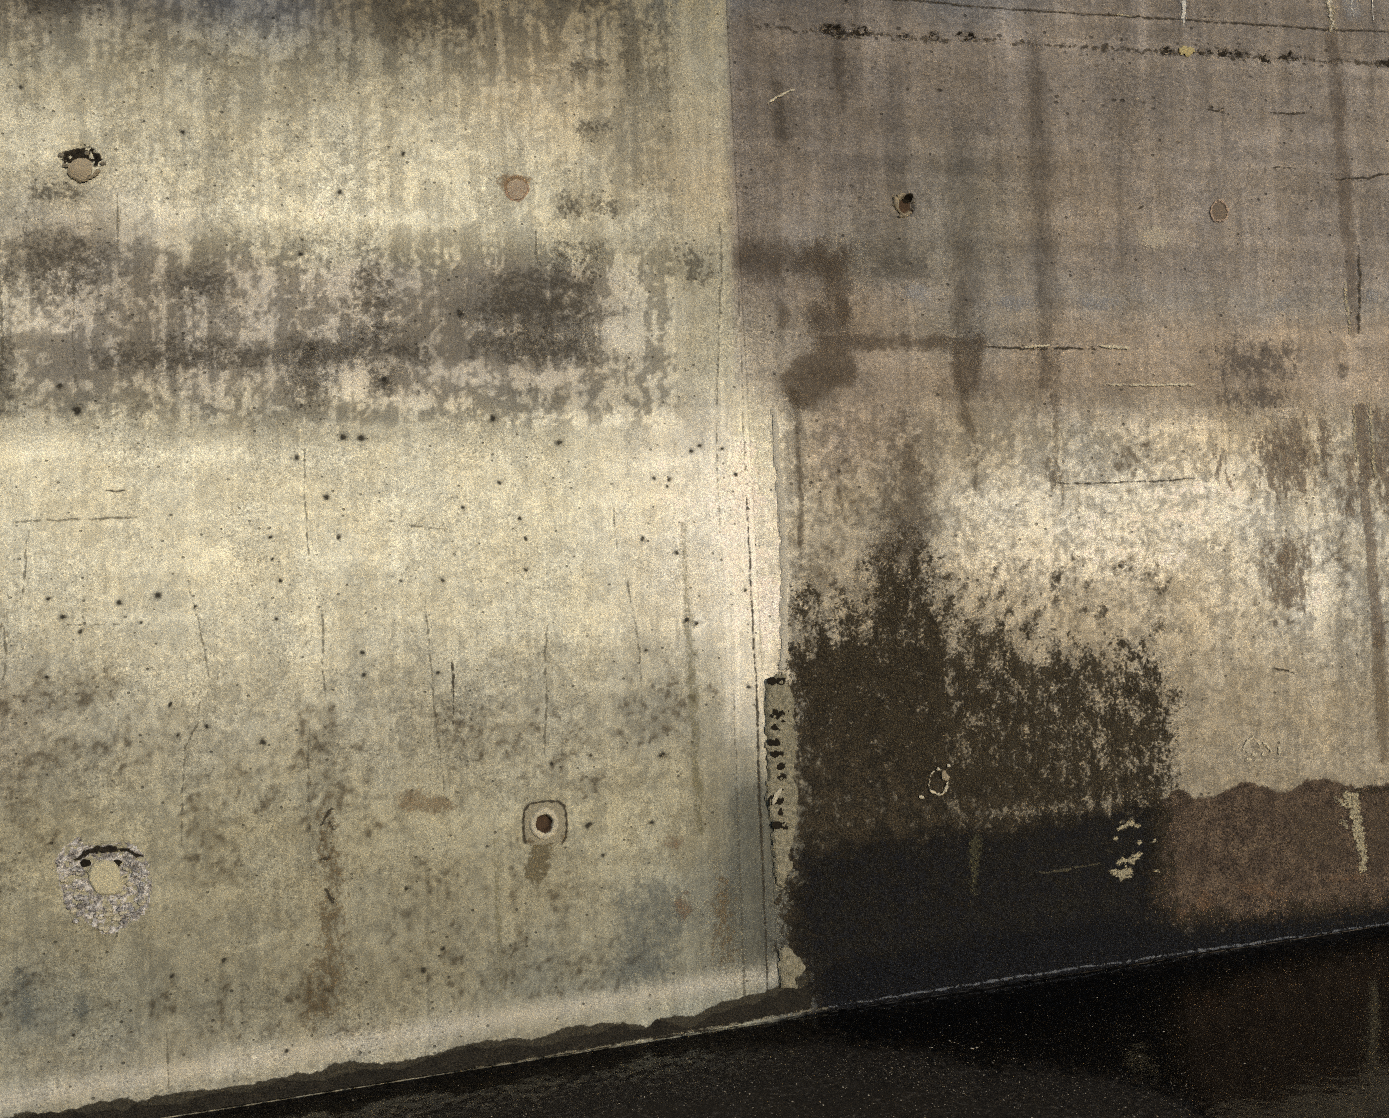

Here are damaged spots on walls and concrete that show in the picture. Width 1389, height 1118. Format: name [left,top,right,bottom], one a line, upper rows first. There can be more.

water stain [1325,0,1354,32]
crack [1337,172,1389,180]
water stain [784,333,986,406]
water stain [10,525,1389,1118]